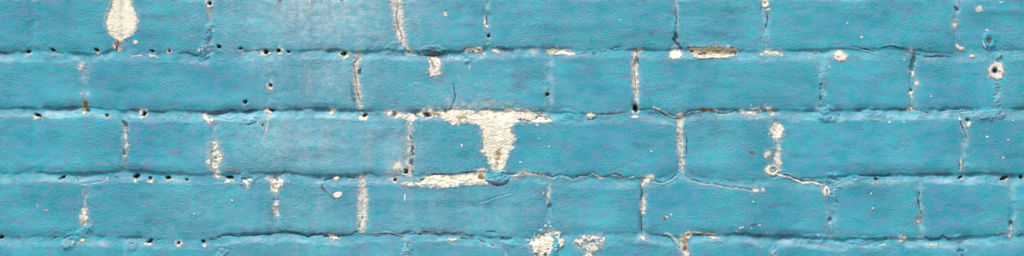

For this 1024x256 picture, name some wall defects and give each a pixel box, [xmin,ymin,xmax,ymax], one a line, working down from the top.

peeling [105,0,139,52]
spalling [669,33,738,60]
peeling [205,140,284,216]
peeling [384,100,552,208]
crack [478,47,750,207]
peeling [526,224,607,256]